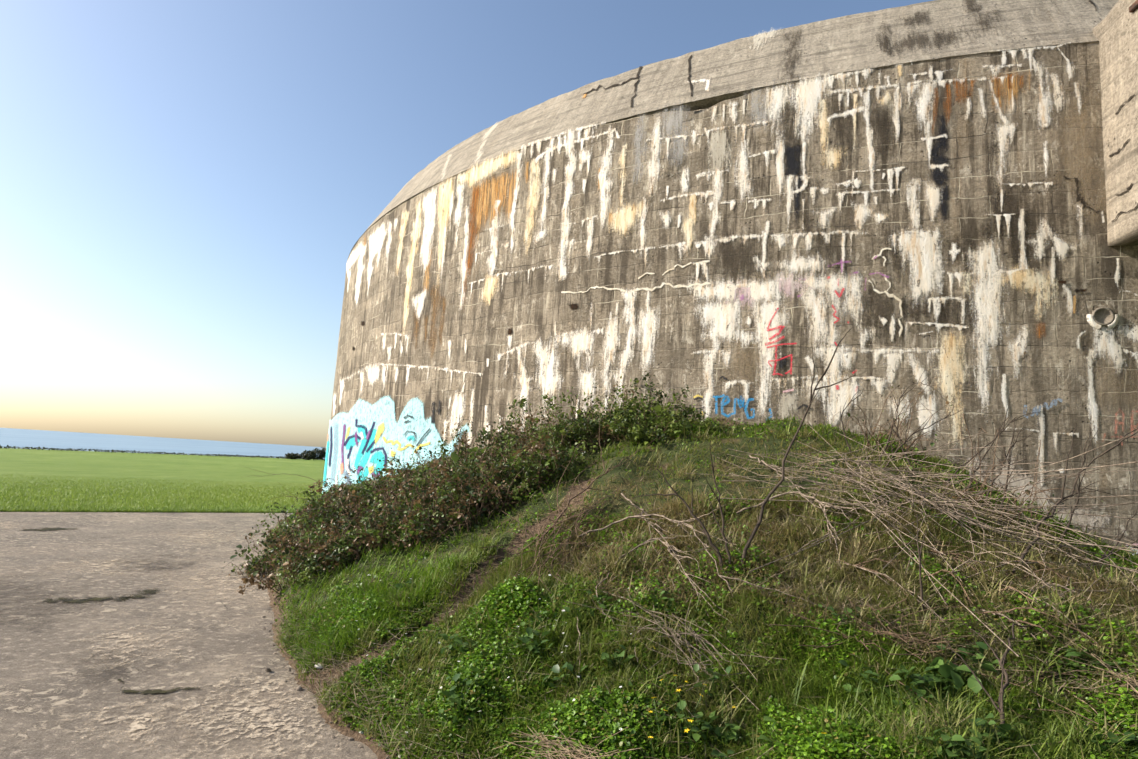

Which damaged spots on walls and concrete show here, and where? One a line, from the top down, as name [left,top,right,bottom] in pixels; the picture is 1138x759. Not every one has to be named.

leakage [966,0,997,33]
crack [583,66,643,107]
crack [687,55,710,96]
corrosion [992,73,1030,104]
crack [1064,176,1138,222]
corrosion [463,171,519,284]
leakage [333,12,1138,486]